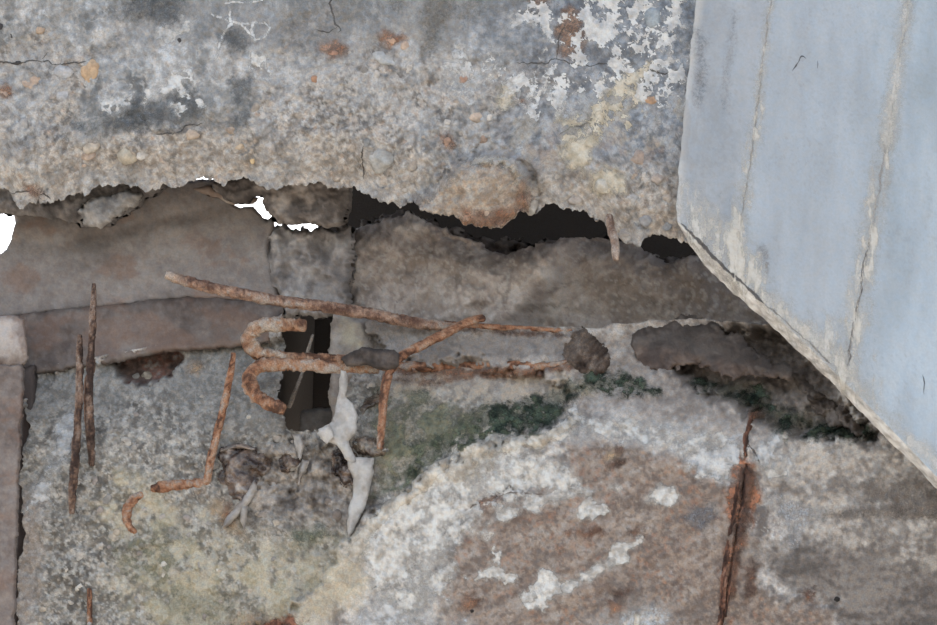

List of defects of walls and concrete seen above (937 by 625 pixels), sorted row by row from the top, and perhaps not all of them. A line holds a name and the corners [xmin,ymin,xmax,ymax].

spalling [0,0,698,625]
damp [348,402,740,625]
rust [723,455,761,599]
damp [754,434,796,478]
spalling [673,326,878,625]
damp [840,479,937,521]